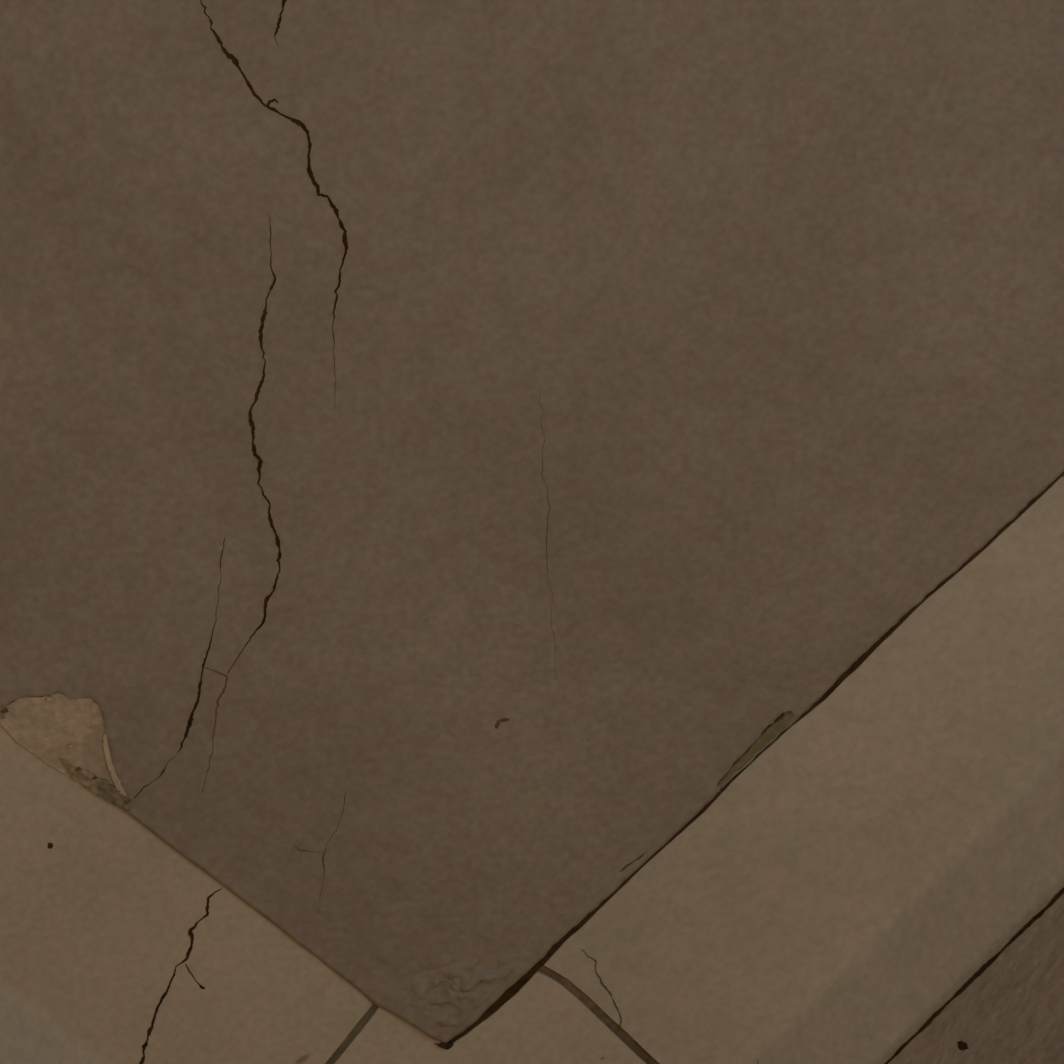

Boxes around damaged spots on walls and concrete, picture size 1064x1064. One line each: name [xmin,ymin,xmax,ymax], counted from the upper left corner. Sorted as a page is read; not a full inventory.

crack [200,0,349,390]
crack [134,215,282,798]
spalling [0,692,135,812]
crack [139,888,222,1064]